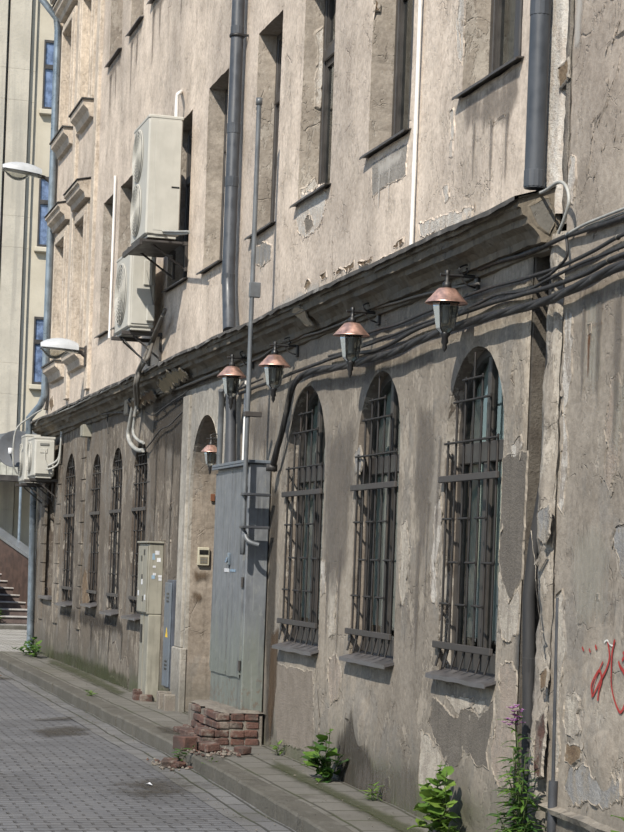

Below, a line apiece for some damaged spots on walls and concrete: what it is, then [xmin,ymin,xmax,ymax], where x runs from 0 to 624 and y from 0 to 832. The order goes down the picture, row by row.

crack [567,0,624,183]
peeling [297,177,328,241]
peeling [418,183,475,238]
peeling [537,308,574,545]
damp [63,611,122,651]
peeling [418,660,519,791]
peeling [498,434,529,645]
peeling [531,588,624,812]